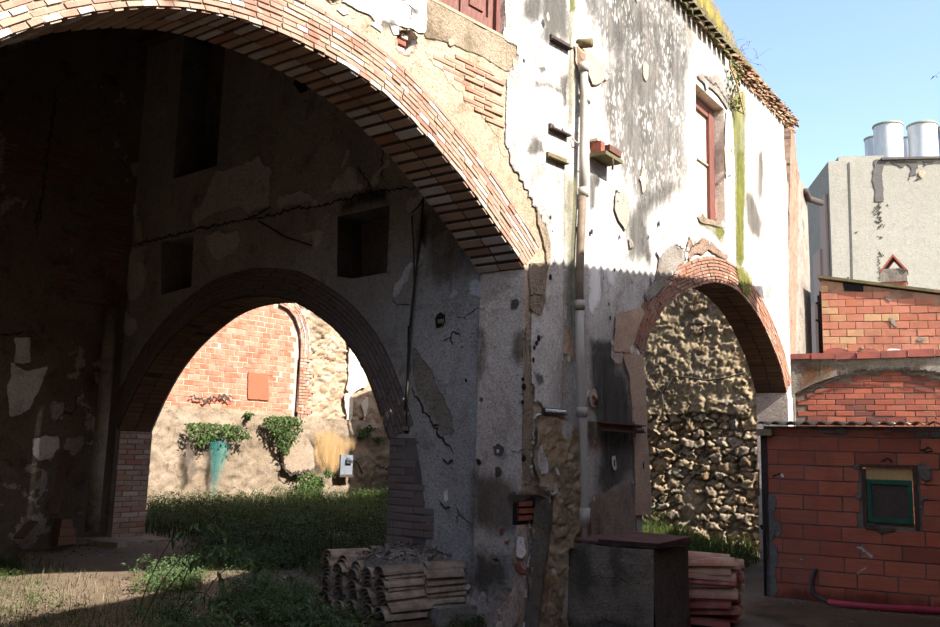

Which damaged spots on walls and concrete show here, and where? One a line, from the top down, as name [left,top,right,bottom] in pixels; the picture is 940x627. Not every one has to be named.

leakage [524,0,573,113]
leakage [529,138,543,154]
leakage [586,0,693,258]
crack [131,151,416,247]
leakage [737,151,763,259]
flaking render [327,0,636,627]
flaking render [608,235,728,364]
flaking render [7,337,48,417]
flaking render [32,435,60,461]
flaking render [247,372,269,400]
crack [412,389,454,465]